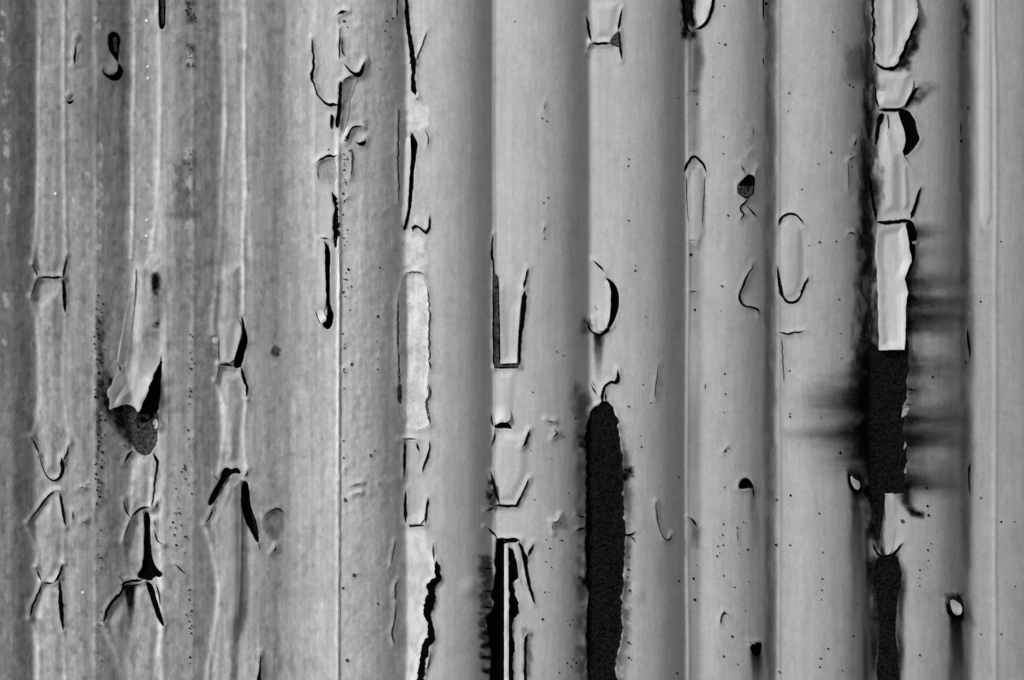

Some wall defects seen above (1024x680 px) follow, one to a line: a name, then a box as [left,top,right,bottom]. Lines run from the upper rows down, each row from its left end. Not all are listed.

peeling [93,269,164,632]
peeling [212,317,248,396]
peeling [315,75,357,329]
spalling [391,95,442,680]
peeling [491,405,512,447]
peeling [491,236,528,369]
peeling [504,543,528,680]
peeling [583,259,619,357]
corrosion [576,370,635,680]
corrosion [825,277,940,680]
peeling [869,0,925,350]